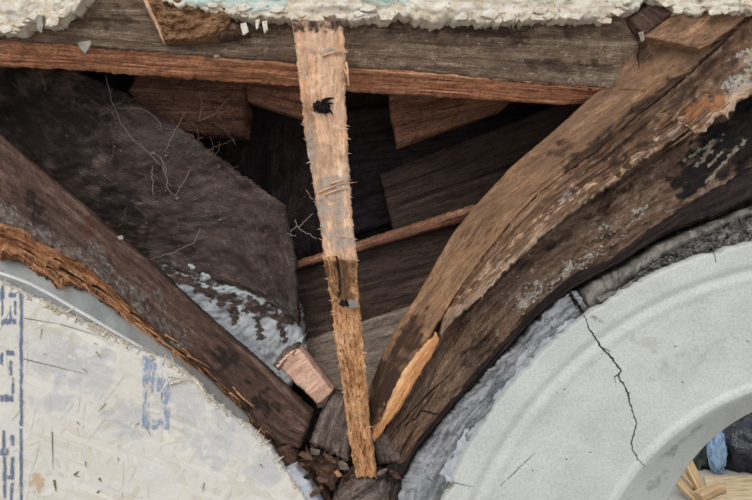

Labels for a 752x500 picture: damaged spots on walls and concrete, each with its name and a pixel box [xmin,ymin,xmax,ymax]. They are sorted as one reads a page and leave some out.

crack [553,292,645,466]